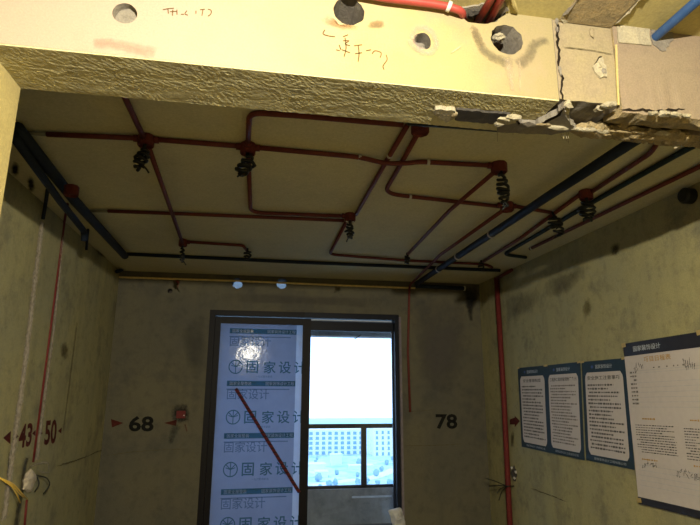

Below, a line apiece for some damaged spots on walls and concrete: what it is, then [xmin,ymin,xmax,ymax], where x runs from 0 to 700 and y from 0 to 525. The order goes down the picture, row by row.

spalling [433,99,692,149]
crack [539,18,610,127]